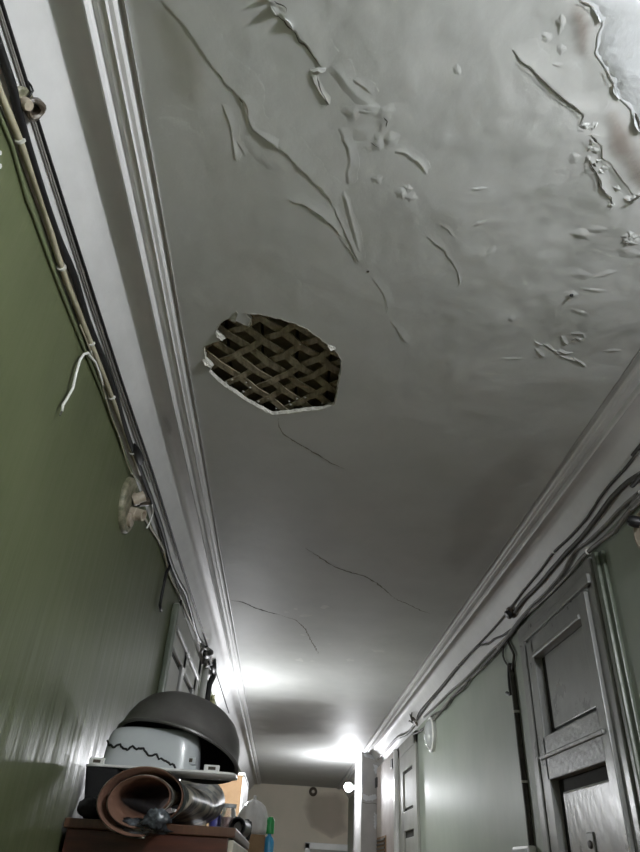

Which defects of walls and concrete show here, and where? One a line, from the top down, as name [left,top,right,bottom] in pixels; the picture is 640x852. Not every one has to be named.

peeling [266,0,379,107]
peeling [580,0,640,132]
flaking render [620,231,640,246]
flaking render [203,311,342,416]
flaking render [534,331,588,366]
crack [307,549,424,612]
crack [238,601,317,651]